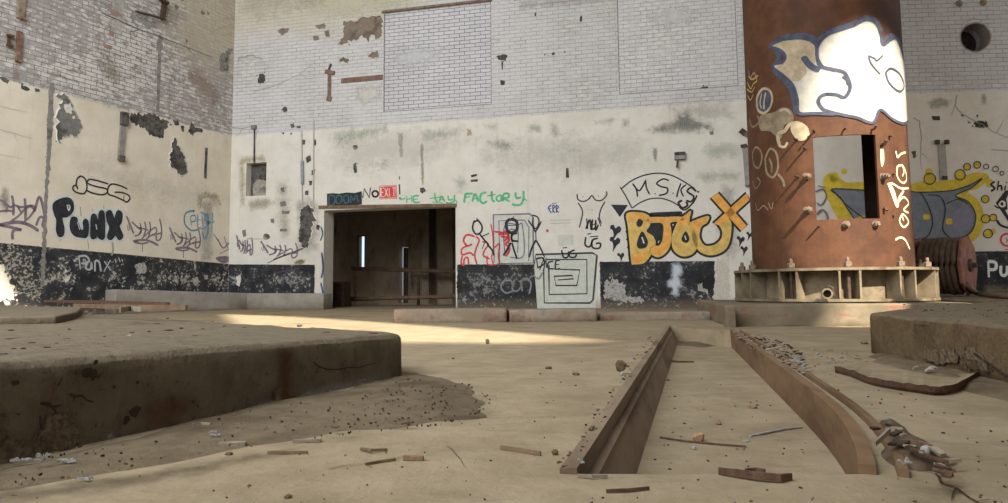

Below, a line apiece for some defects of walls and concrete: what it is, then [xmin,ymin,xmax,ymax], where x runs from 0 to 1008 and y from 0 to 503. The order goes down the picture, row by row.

spalling [313,15,385,63]
spalling [47,92,83,144]
spalling [130,112,203,177]
spalling [271,140,320,249]